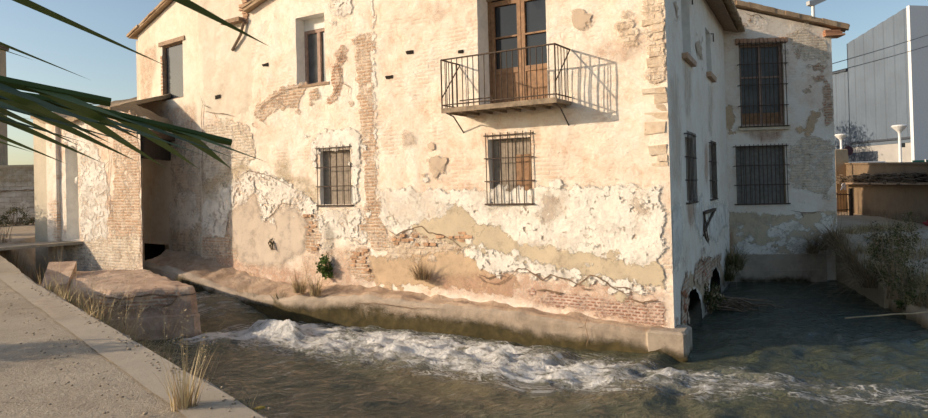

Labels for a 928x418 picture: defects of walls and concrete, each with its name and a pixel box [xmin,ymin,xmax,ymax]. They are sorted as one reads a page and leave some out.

flaking render [613,0,679,85]
flaking render [63,119,142,271]
crack [386,226,464,252]
peeling [168,33,683,326]
crack [474,268,661,307]
flaking render [726,105,736,134]
flaking render [677,197,837,325]
flaking render [782,22,835,200]